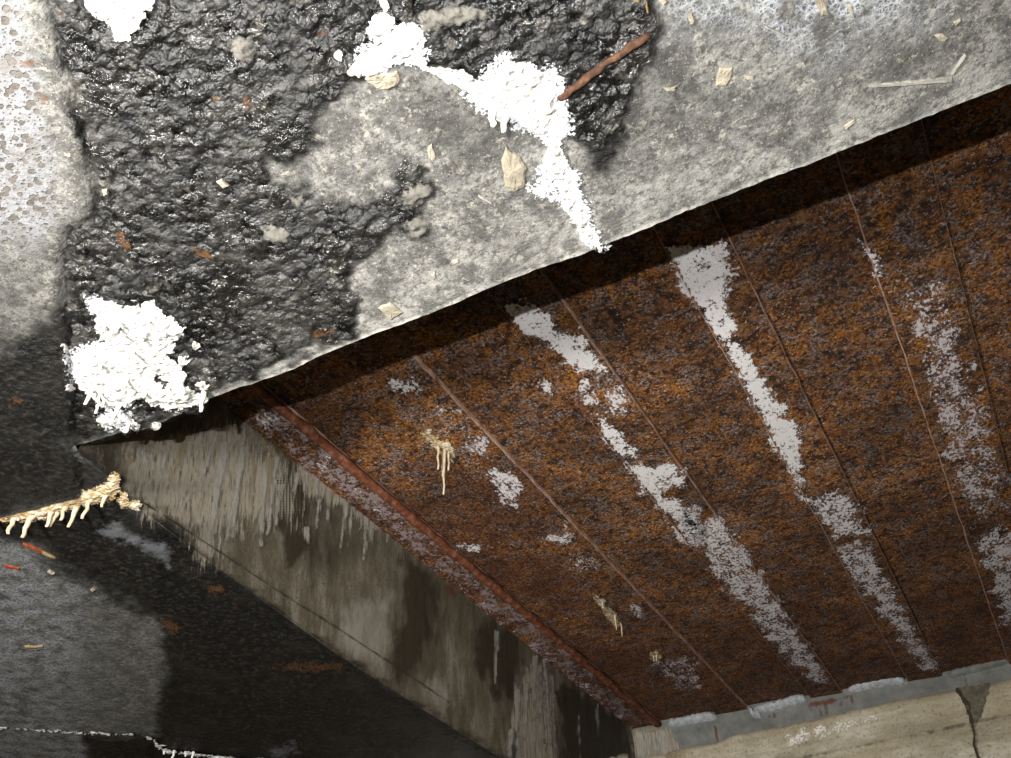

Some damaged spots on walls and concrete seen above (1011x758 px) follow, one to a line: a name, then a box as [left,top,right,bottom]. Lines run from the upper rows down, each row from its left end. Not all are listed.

leakage [333,0,612,253]
leakage [588,136,623,171]
leakage [0,293,679,758]
crack [971,725,980,758]